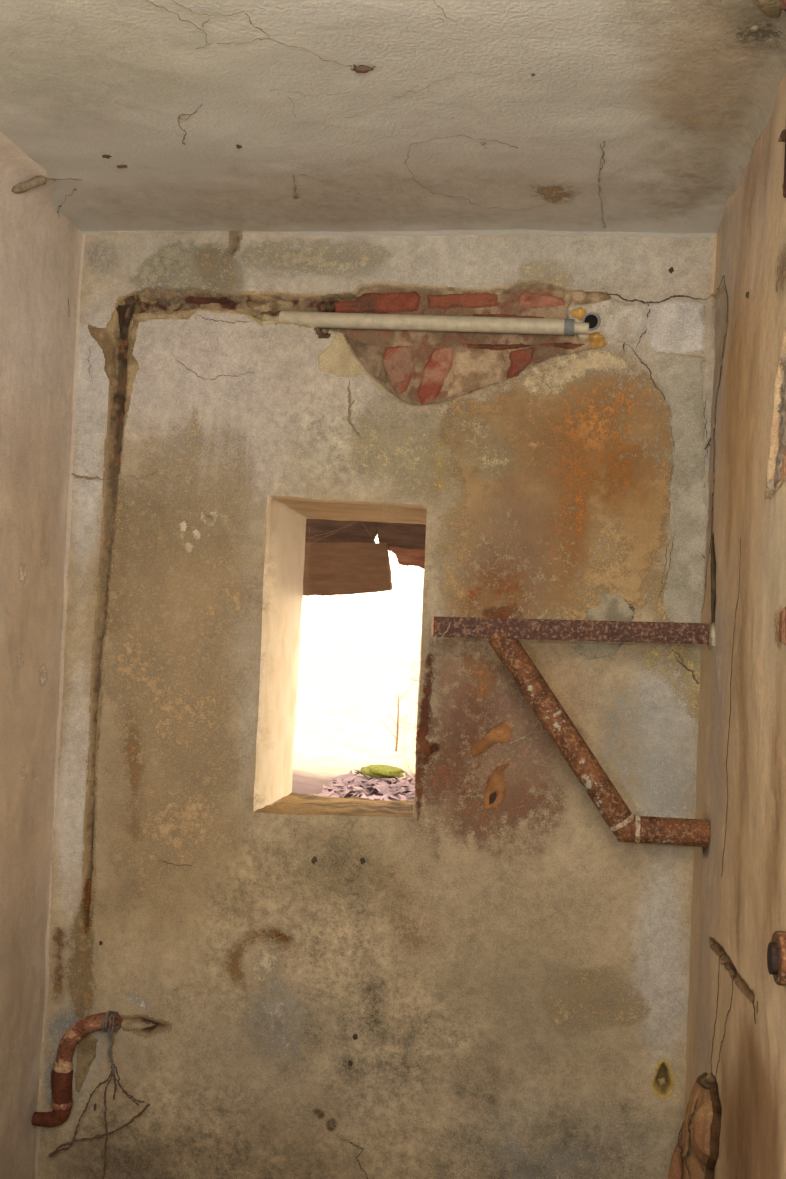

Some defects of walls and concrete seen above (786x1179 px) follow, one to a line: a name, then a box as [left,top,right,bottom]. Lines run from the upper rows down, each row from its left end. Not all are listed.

leakage [717,12,783,44]
flaking render [314,278,611,407]
rust [437,349,675,620]
flaking render [764,327,786,500]
rust [411,638,562,858]
crack [711,954,736,1081]